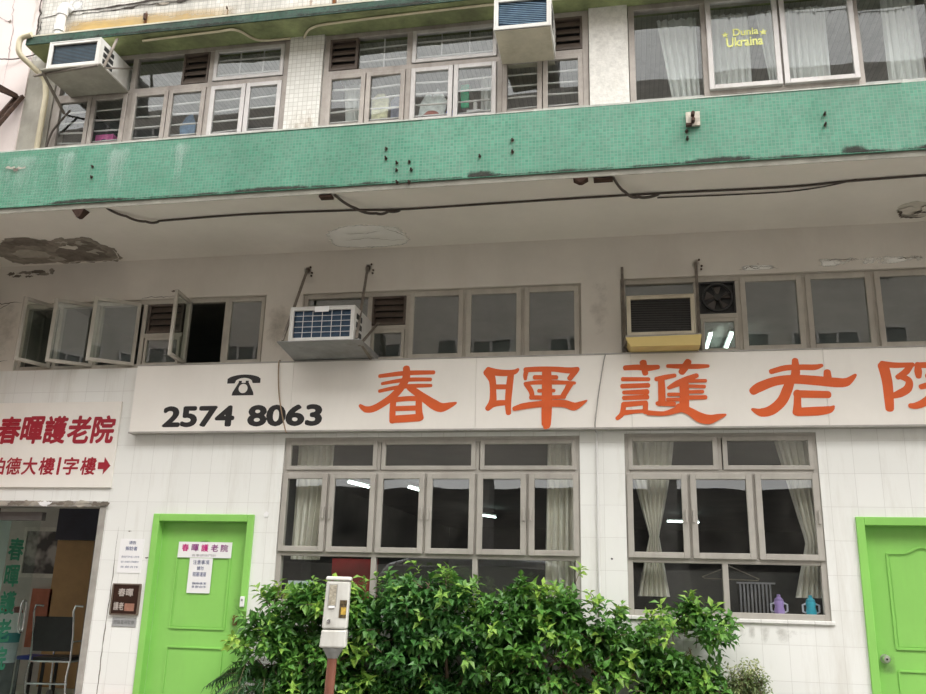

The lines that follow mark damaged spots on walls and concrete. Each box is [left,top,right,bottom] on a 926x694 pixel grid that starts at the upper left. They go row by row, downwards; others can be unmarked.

peeling [897,201,926,218]
spalling [0,237,123,278]